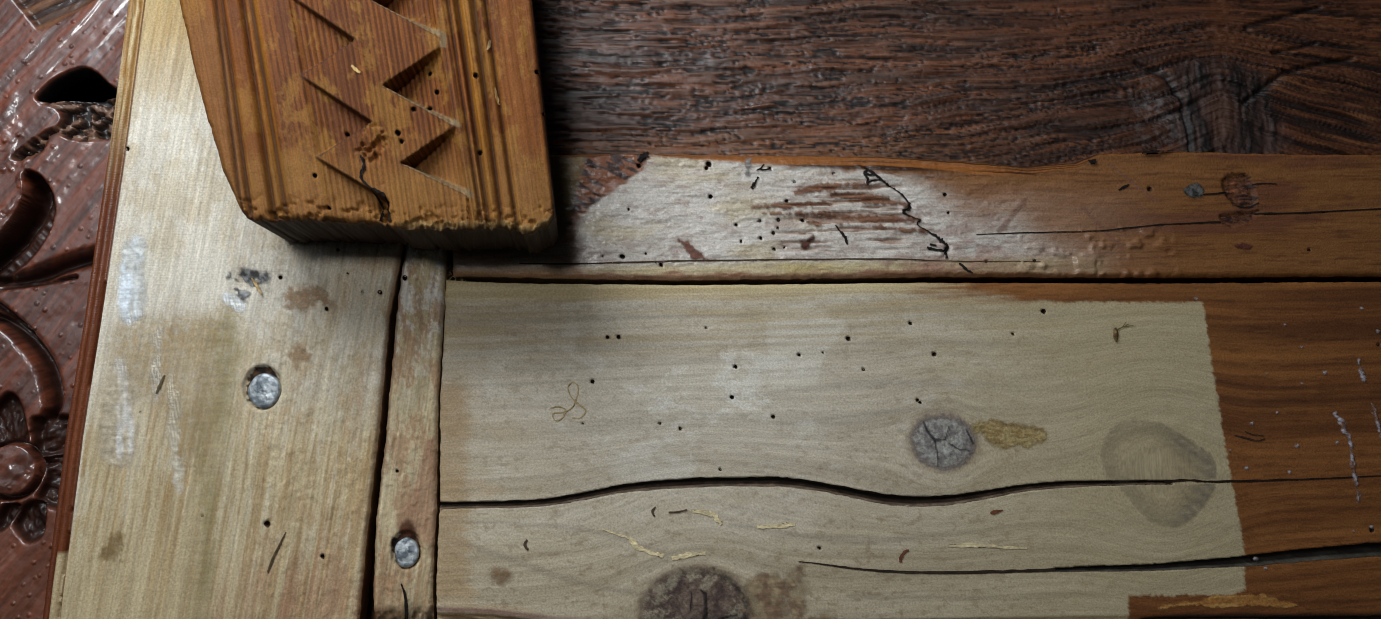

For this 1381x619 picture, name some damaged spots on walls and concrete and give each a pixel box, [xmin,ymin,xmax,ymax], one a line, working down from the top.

crack [359,155,391,222]
crack [519,168,1221,273]
crack [1254,207,1381,215]
crack [440,475,1381,509]
crack [799,542,1381,574]
crack [1142,611,1381,619]